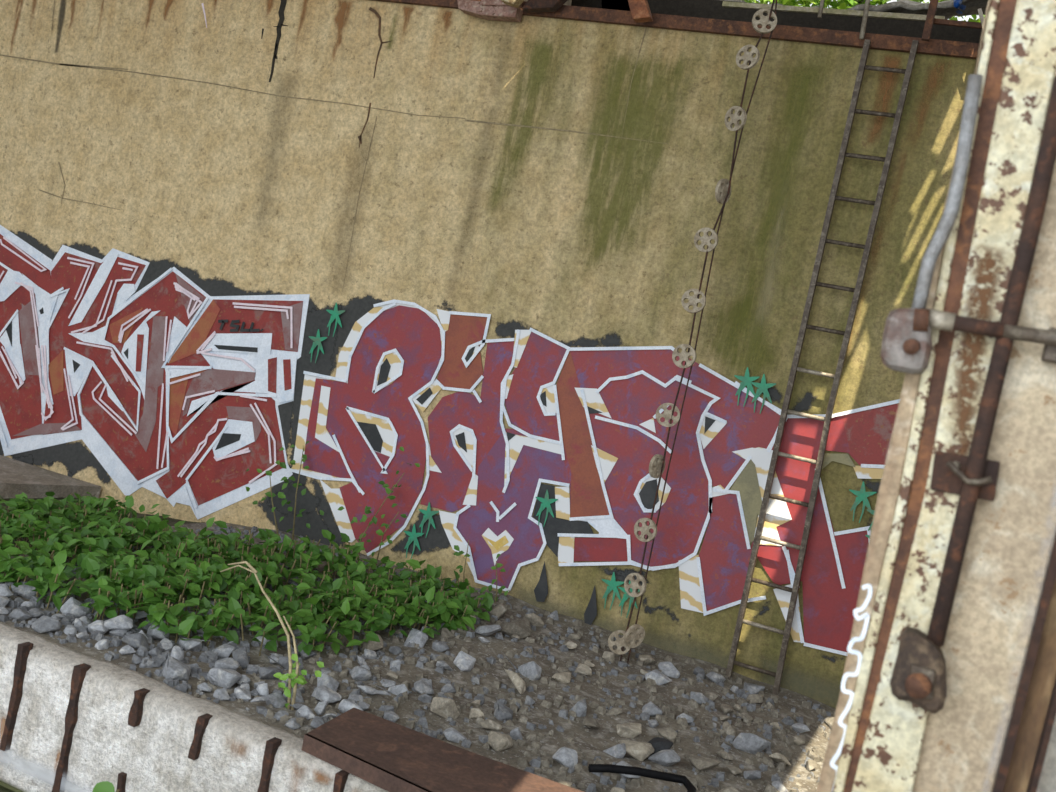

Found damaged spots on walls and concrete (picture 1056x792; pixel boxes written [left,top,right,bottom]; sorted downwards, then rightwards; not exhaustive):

crack [0,0,668,292]
corrosion [333,1,350,56]
corrosion [943,0,1017,321]
corrosion [843,330,986,792]